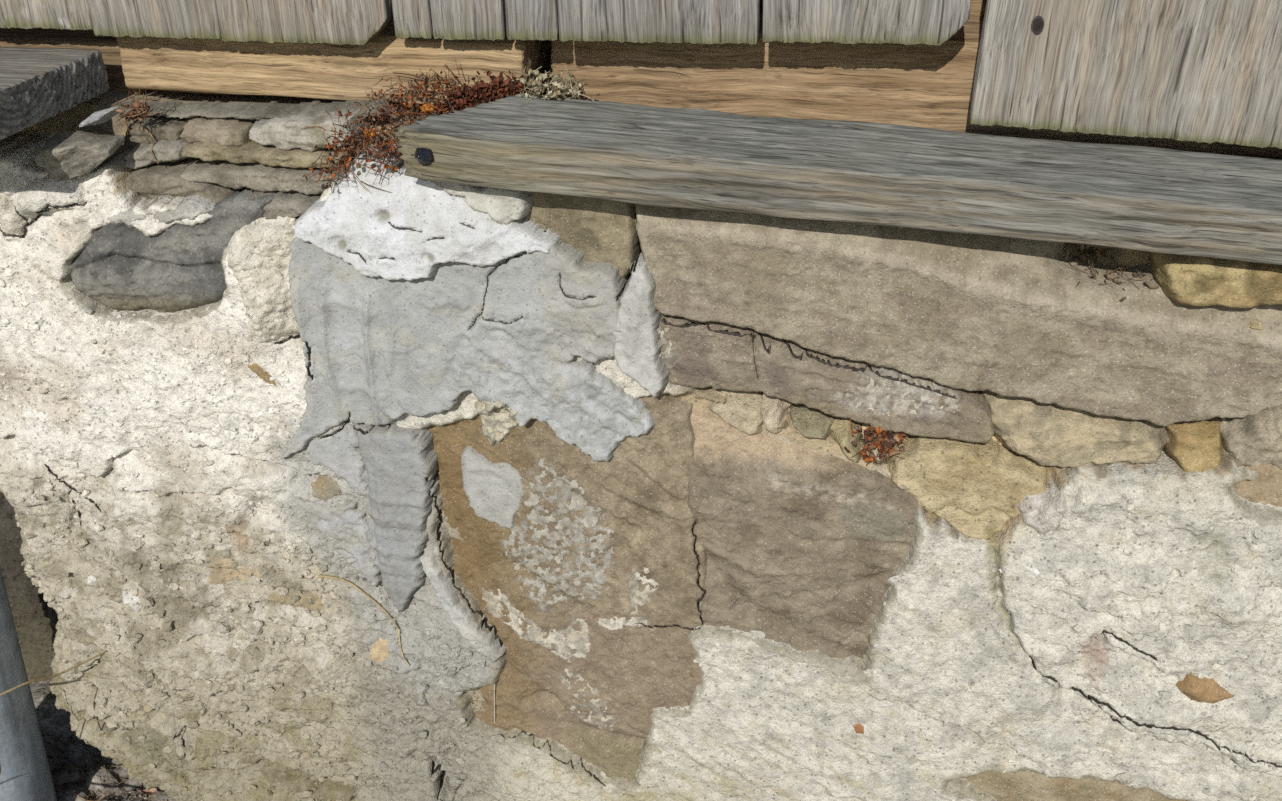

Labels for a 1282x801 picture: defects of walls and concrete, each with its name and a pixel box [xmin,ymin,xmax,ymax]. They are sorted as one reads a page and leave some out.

crack [0,203,86,238]
spalling [71,188,277,313]
crack [661,318,957,399]
spalling [427,252,928,781]
crack [635,521,706,630]
crack [1101,630,1158,661]
crack [1029,656,1282,768]
spalling [962,770,1186,801]